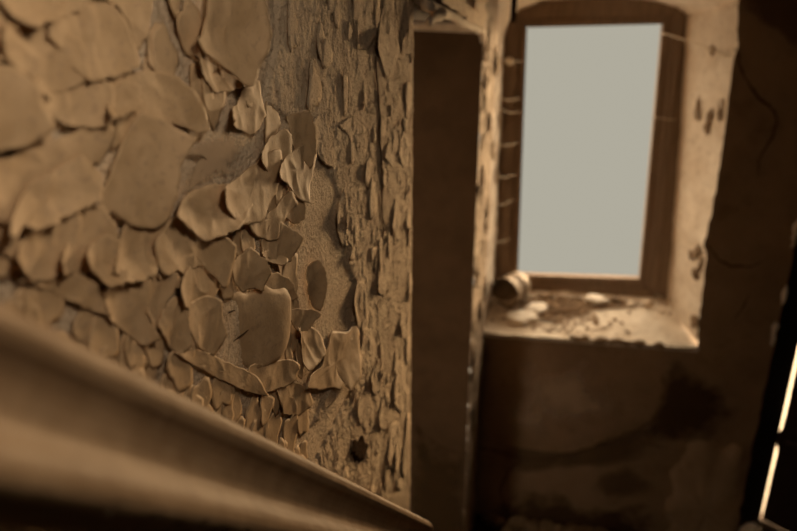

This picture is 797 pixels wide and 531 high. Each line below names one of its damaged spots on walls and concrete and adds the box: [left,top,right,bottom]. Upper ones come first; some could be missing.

peeling [0,0,411,483]
peeling [353,0,422,78]